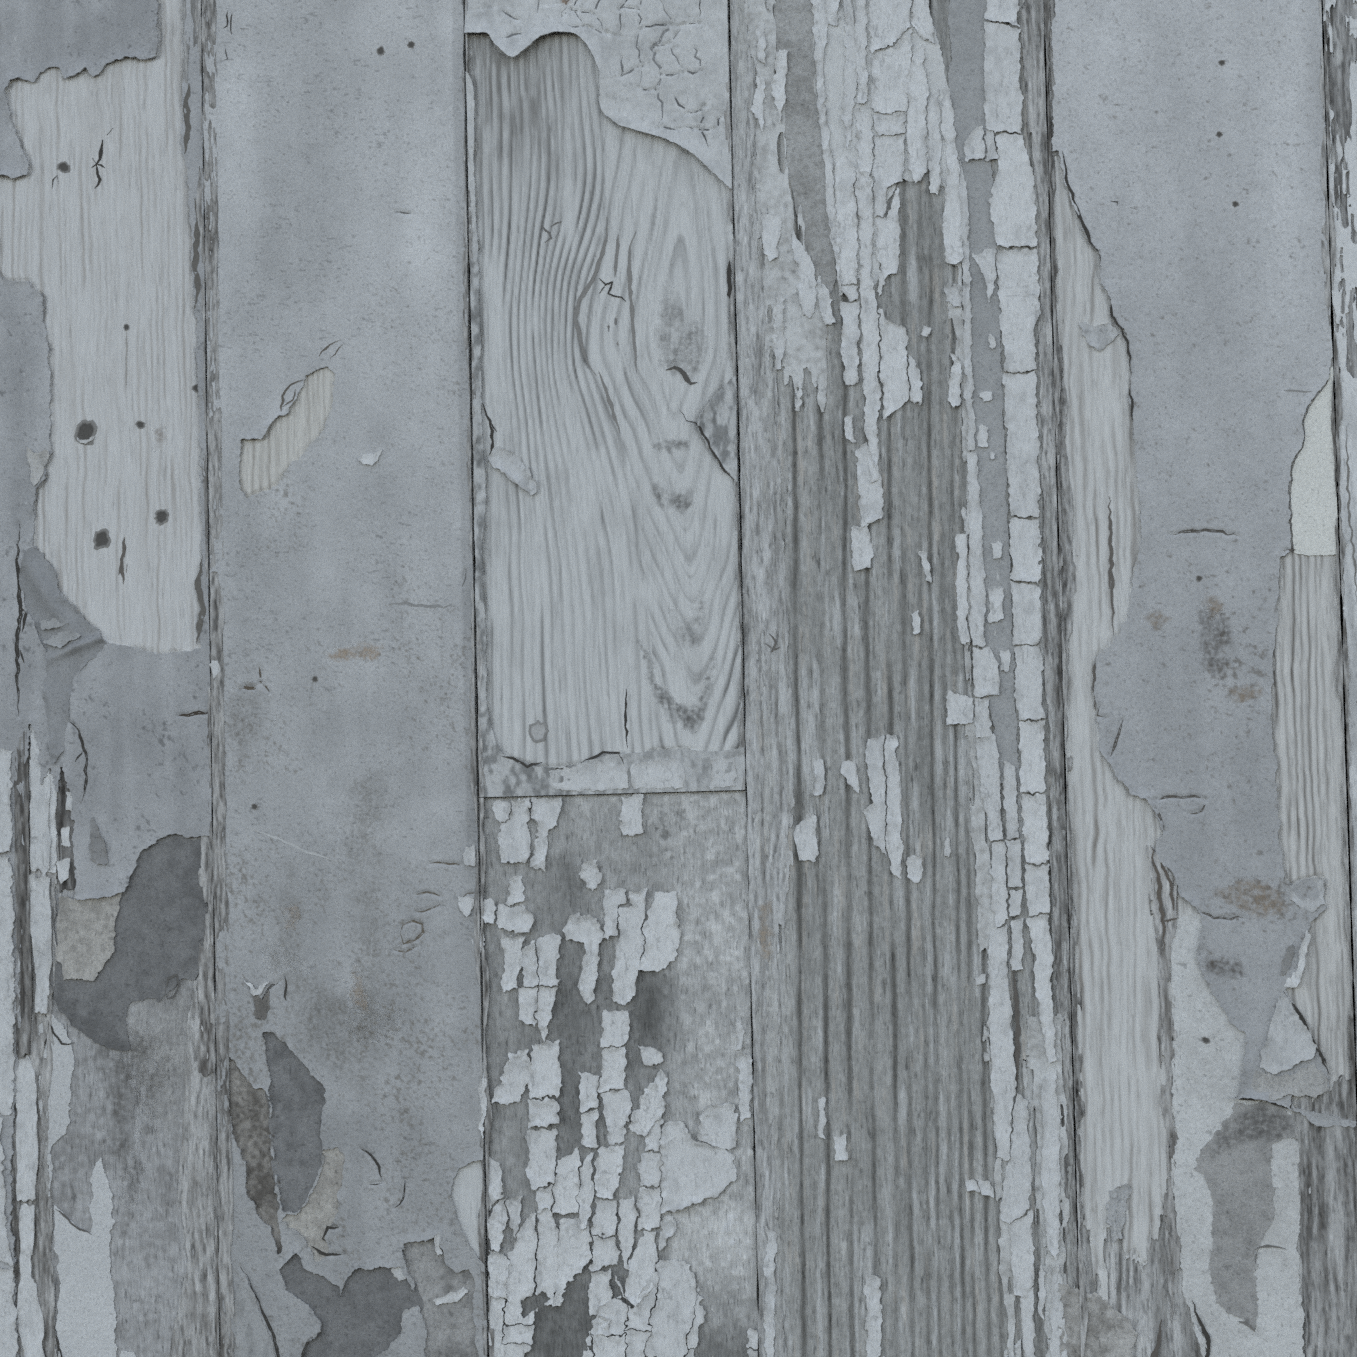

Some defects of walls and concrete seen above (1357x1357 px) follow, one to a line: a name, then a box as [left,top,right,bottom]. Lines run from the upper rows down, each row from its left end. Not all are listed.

peeling [0,0,206,655]
crack [502,0,722,145]
peeling [209,660,221,679]
peeling [229,32,753,1357]
peeling [751,0,1357,1357]
peeling [0,724,208,1357]
peeling [746,1226,778,1357]